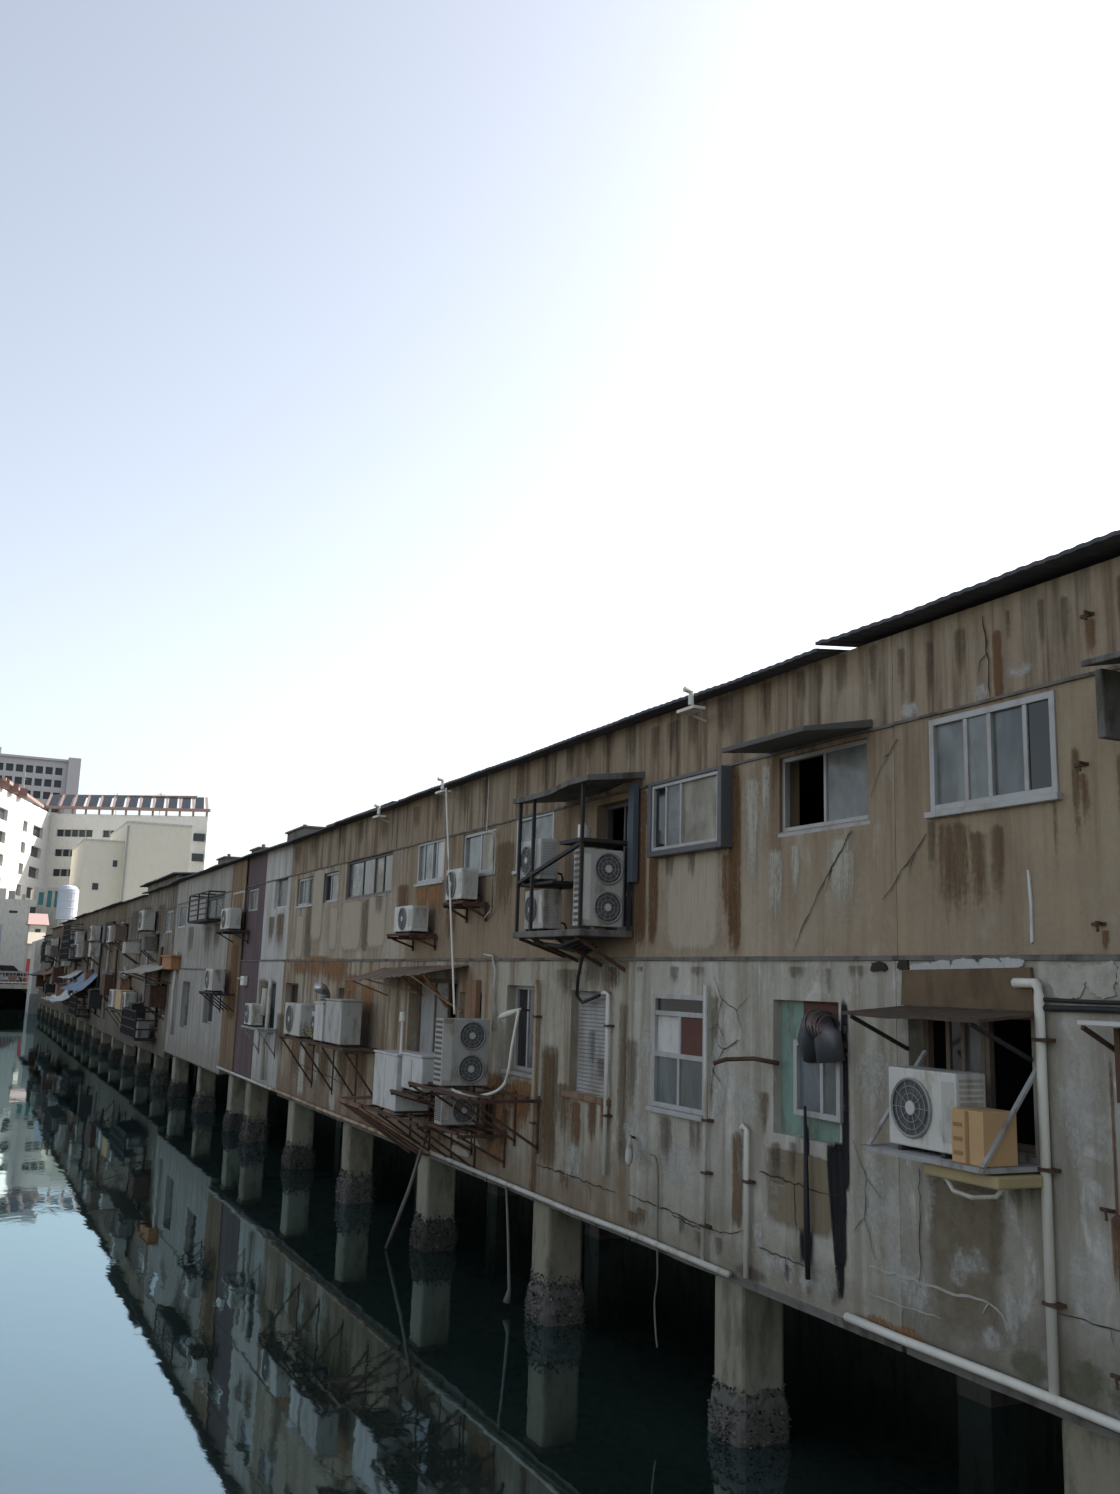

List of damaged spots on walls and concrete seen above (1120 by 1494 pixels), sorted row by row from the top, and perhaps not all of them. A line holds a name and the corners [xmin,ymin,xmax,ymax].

corrosion [993,631,1002,696]
corrosion [722,766,741,949]
crack [793,831,852,950]
crack [882,833,927,900]
spalling [870,870,1034,972]
spalling [1045,960,1120,999]
corrosion [481,1046,569,1165]